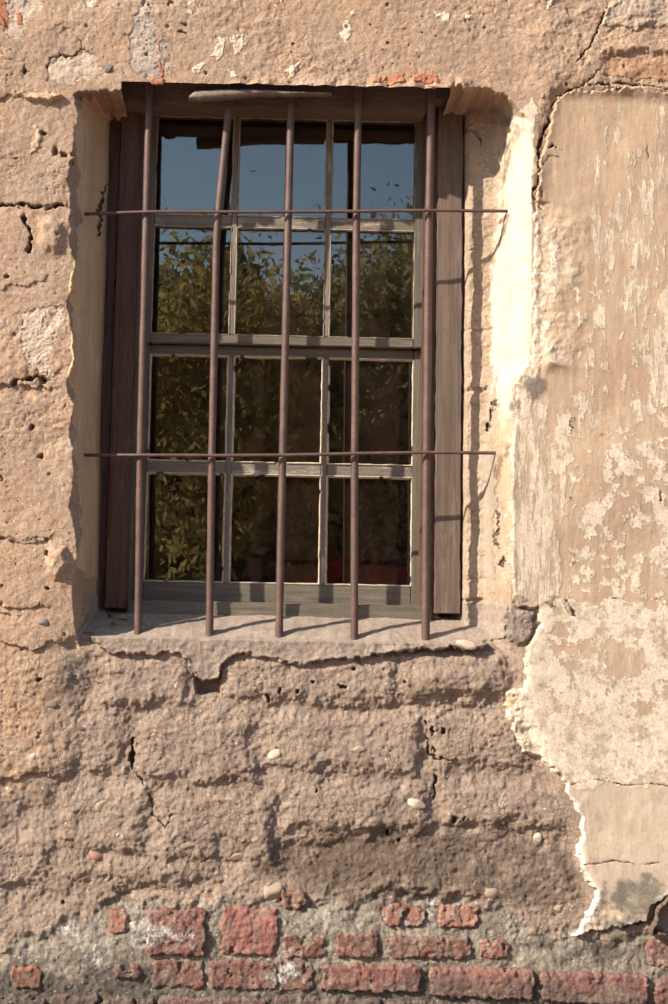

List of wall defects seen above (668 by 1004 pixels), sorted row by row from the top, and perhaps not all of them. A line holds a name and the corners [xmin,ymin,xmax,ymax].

crack [532,8,667,202]
crack [0,202,67,254]
crack [96,184,108,236]
crack [486,399,500,432]
spalling [73,98,668,900]
crack [492,510,506,567]
crack [129,738,172,828]
crack [424,720,449,799]
spalling [648,896,668,937]